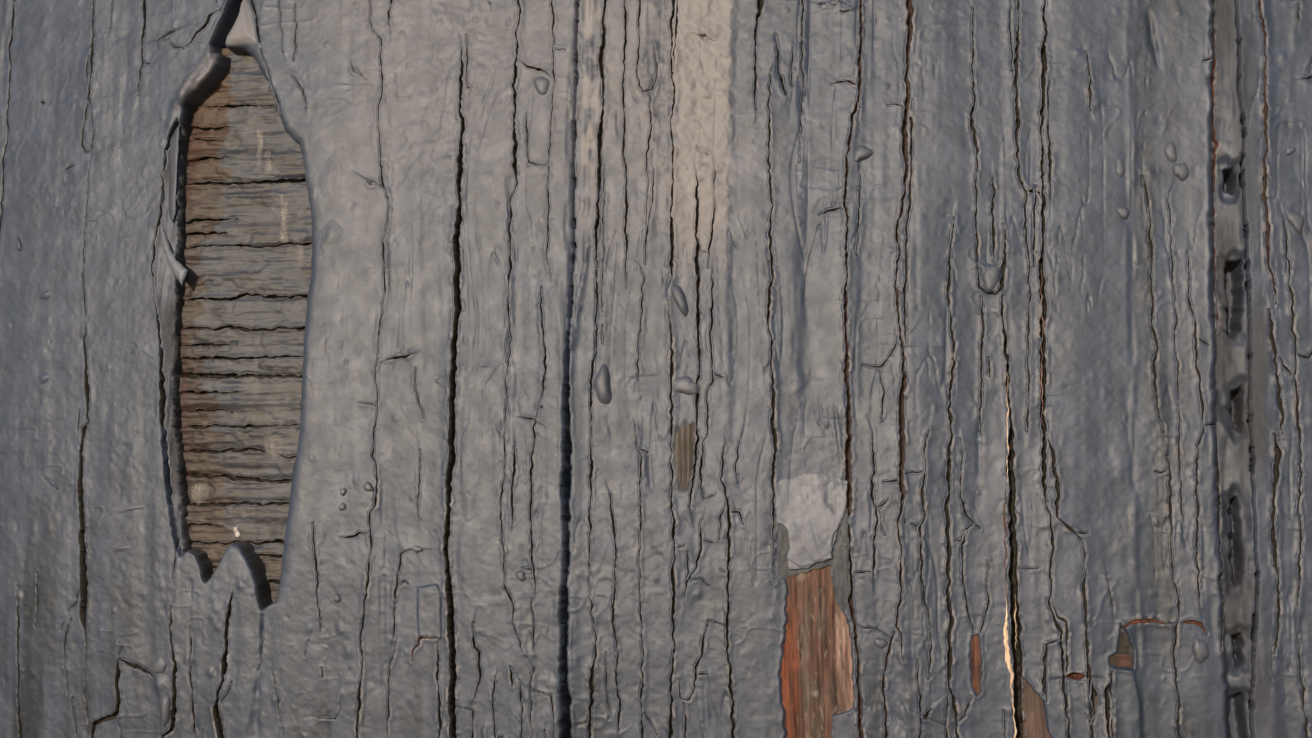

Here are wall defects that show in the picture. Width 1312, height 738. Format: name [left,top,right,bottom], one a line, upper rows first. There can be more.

crack [0,0,16,244]
peeling [160,125,188,286]
crack [16,0,312,738]
crack [304,0,1224,738]
crack [1257,0,1312,738]
peeling [774,473,854,738]
peeling [1021,677,1052,738]